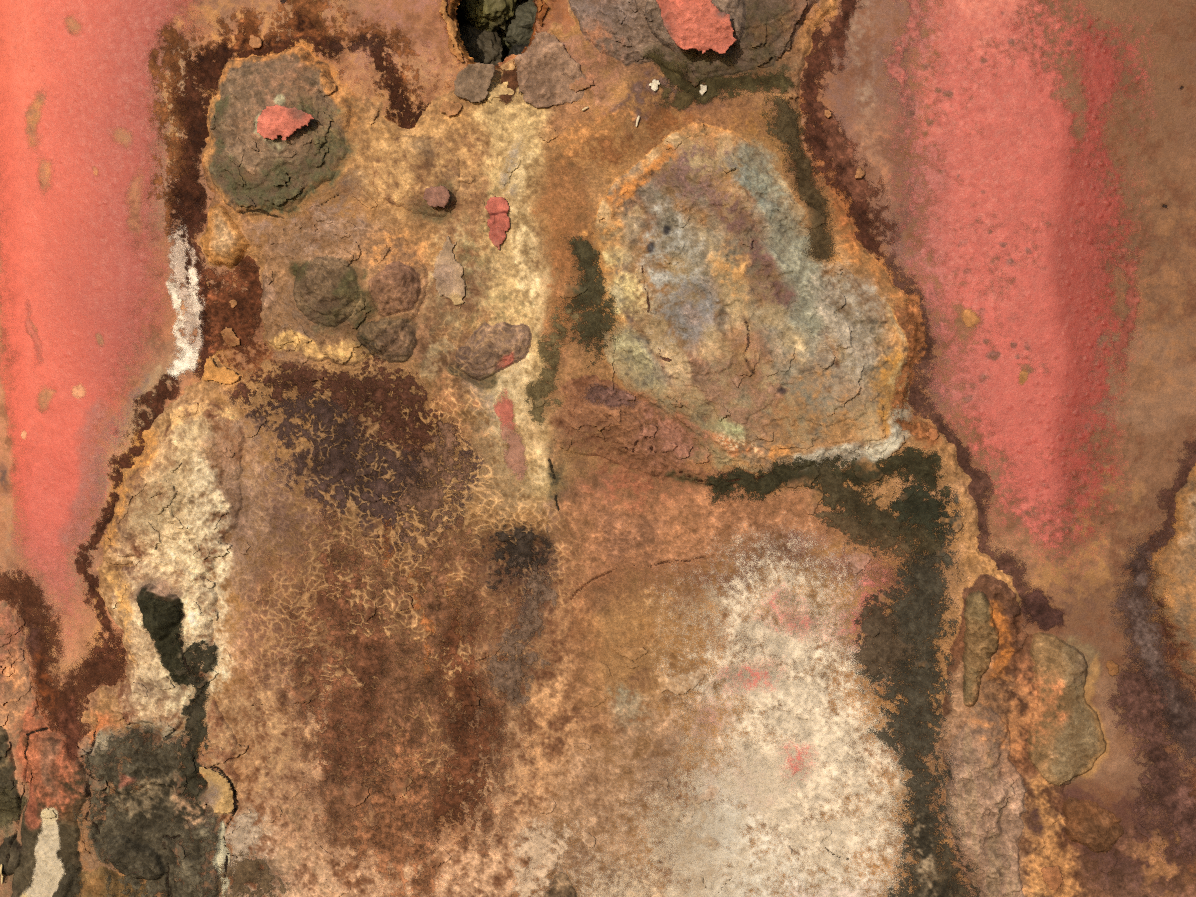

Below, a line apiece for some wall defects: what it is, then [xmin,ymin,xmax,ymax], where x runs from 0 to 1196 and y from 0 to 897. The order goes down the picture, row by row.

hole [435,0,586,117]
peeling [257,105,314,140]
peeling [423,185,451,208]
peeling [485,196,510,250]
efflorescence [166,224,205,380]
peeling [220,327,240,347]
peeling [72,383,87,399]
spalling [581,384,639,408]
spalling [463,514,559,720]
water stain [507,459,953,897]
water stain [174,640,218,804]
spalling [544,872,577,897]